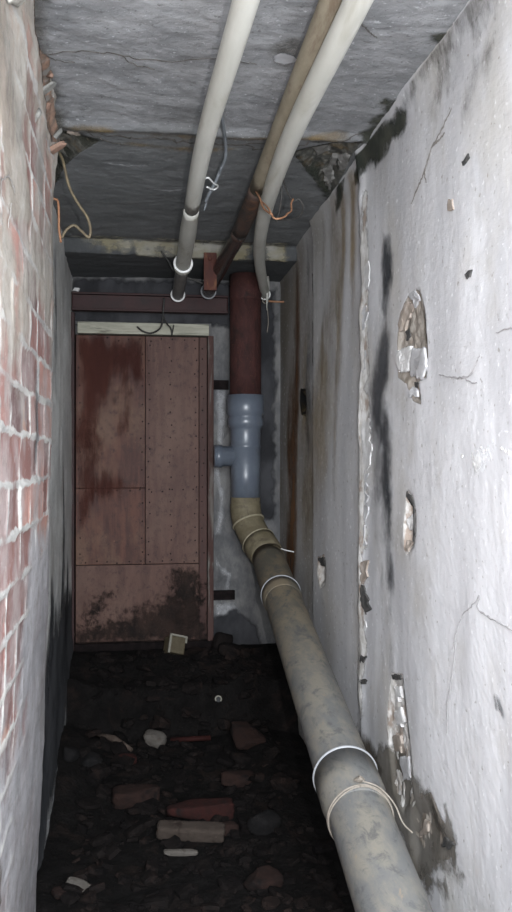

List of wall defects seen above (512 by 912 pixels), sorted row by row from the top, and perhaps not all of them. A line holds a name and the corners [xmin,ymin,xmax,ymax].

spalling [34,0,98,183]
leakage [296,99,406,336]
spalling [396,290,428,404]
leakage [47,484,68,693]
leakage [171,567,205,630]
spalling [403,491,416,554]
leakage [361,737,464,897]
spalling [387,672,456,862]